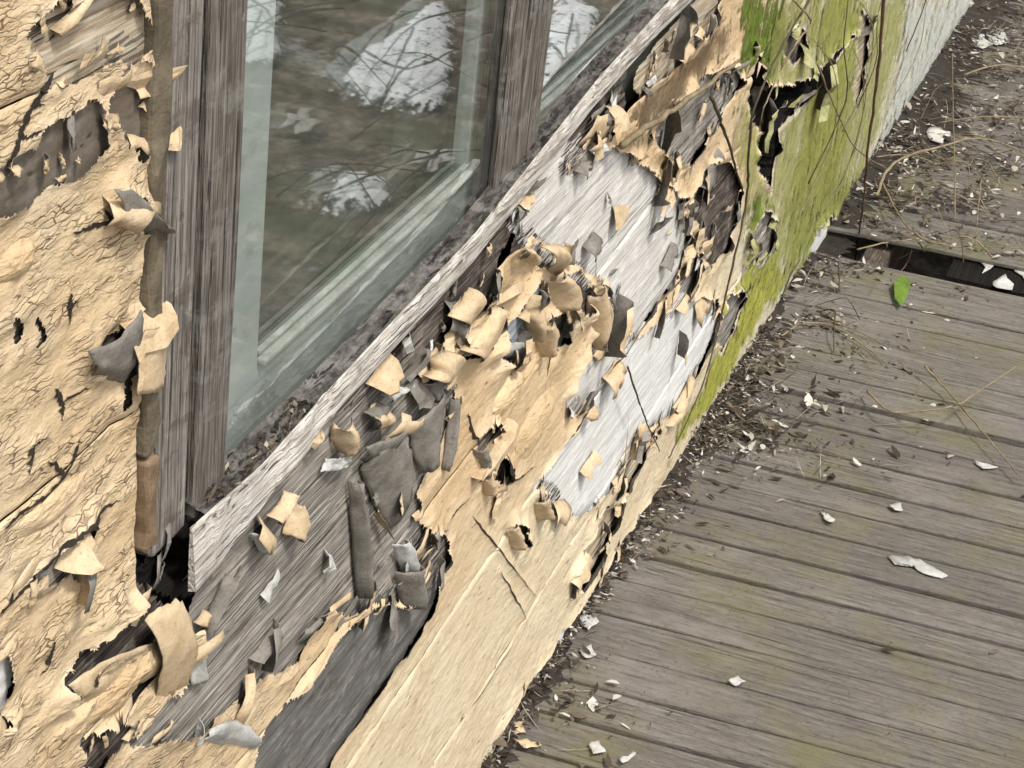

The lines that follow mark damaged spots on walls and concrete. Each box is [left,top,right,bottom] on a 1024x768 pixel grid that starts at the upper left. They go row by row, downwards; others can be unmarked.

crack [3,72,54,172]
peeling [0,0,153,219]
peeling [748,25,839,154]
crack [74,210,113,235]
peeling [810,218,830,265]
damp [677,0,973,445]
peeling [13,317,47,348]
peeling [64,0,779,768]
crack [5,387,92,530]
peeling [7,531,104,614]
crack [0,500,121,615]
crack [452,499,536,617]